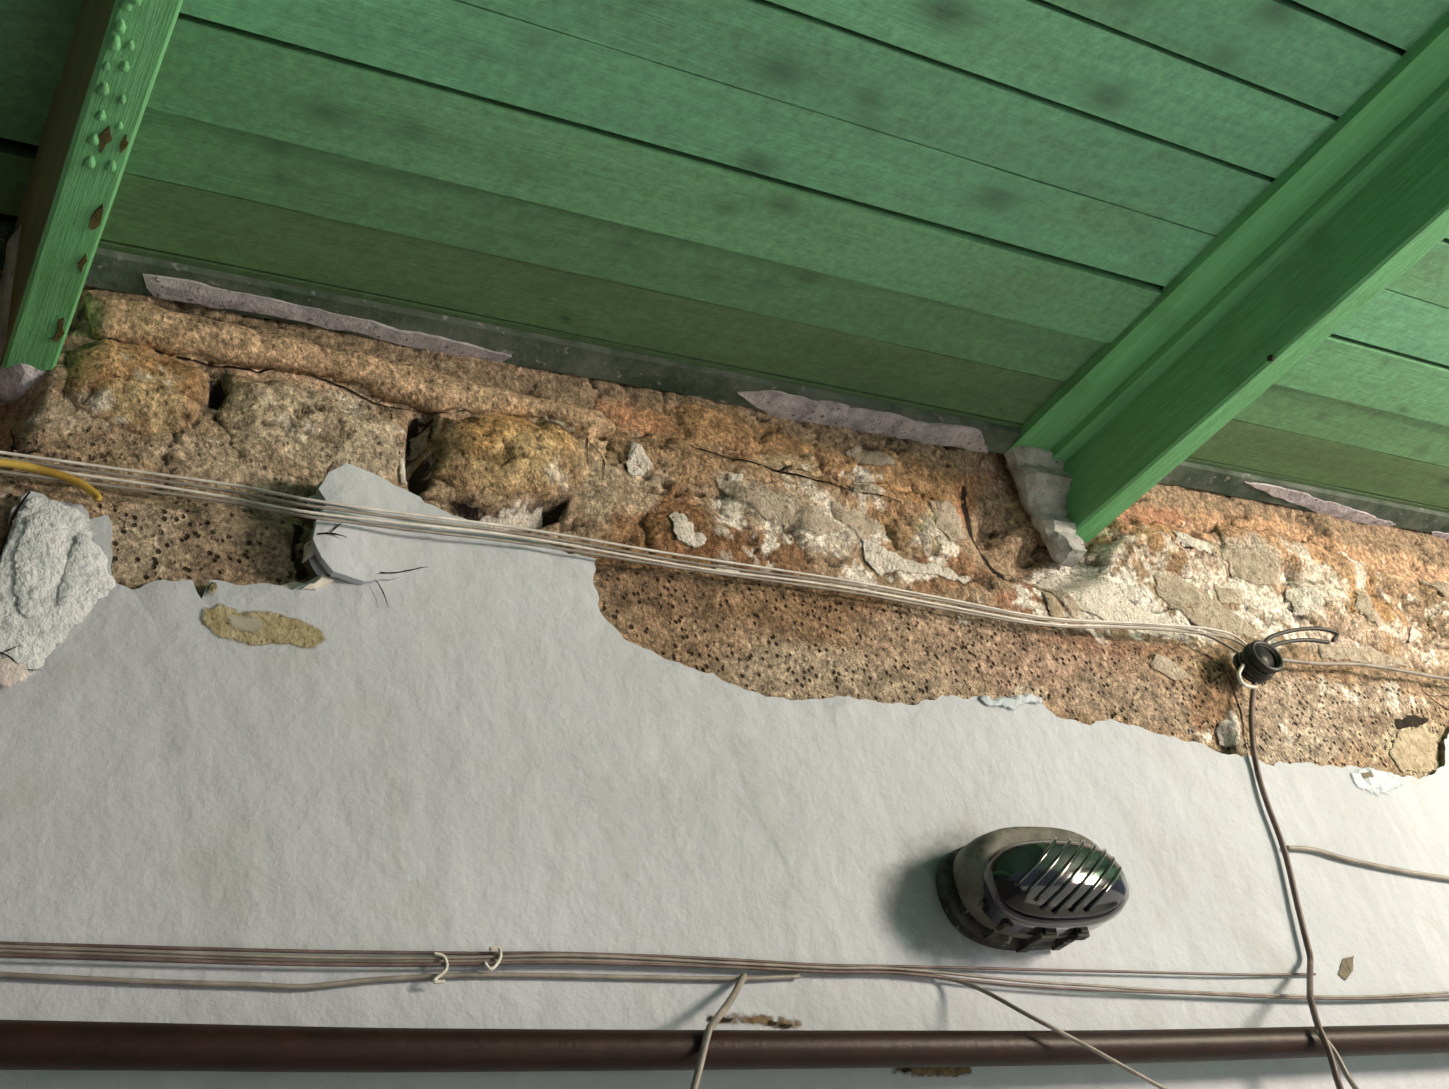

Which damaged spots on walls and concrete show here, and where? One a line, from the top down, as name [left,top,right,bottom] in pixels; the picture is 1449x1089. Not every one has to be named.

peeling [99,126,129,155]
peeling [90,204,103,230]
spalling [0,254,1449,795]